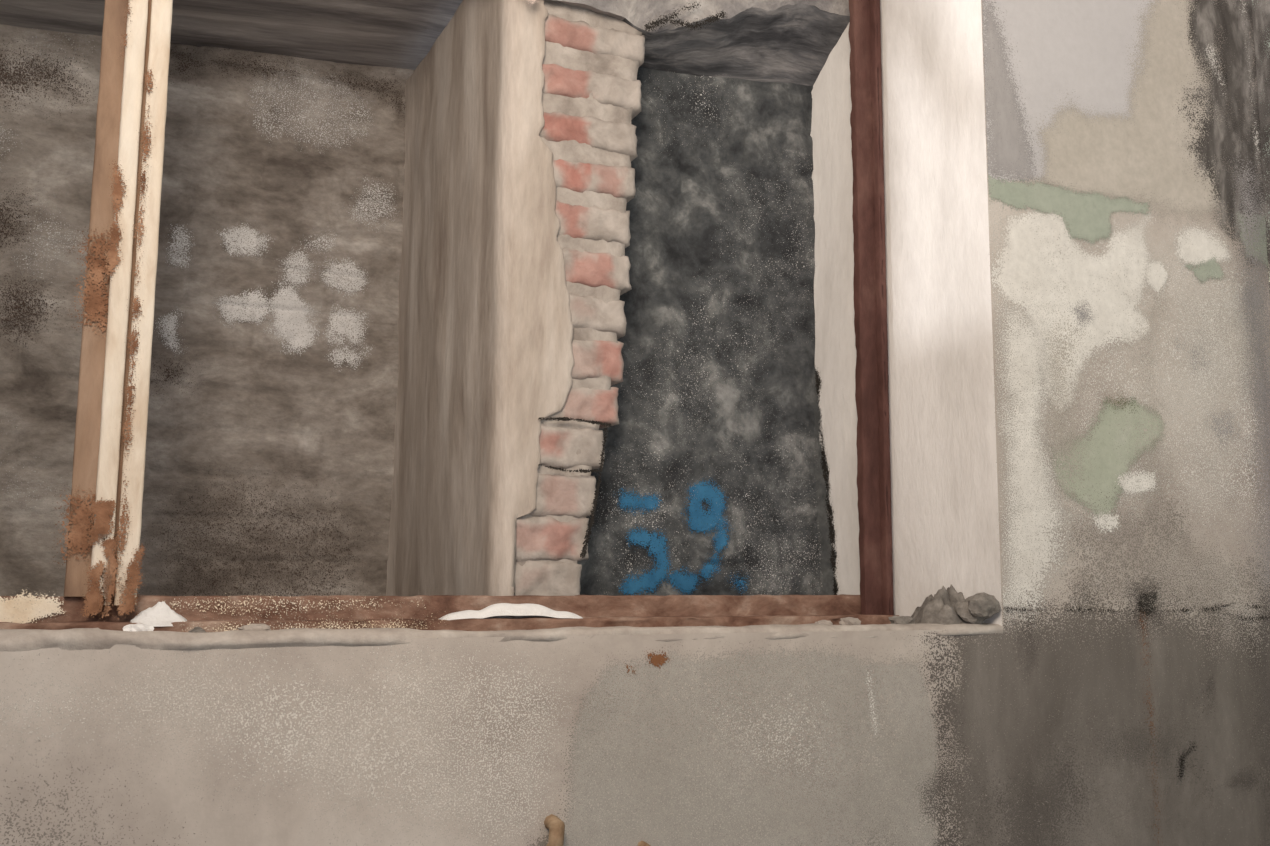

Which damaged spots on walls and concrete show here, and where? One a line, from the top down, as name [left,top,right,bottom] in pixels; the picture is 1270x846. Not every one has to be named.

corrosion [52,69,157,619]
damp [904,0,1270,846]
peeling [988,174,1270,643]
spalling [1121,571,1172,846]